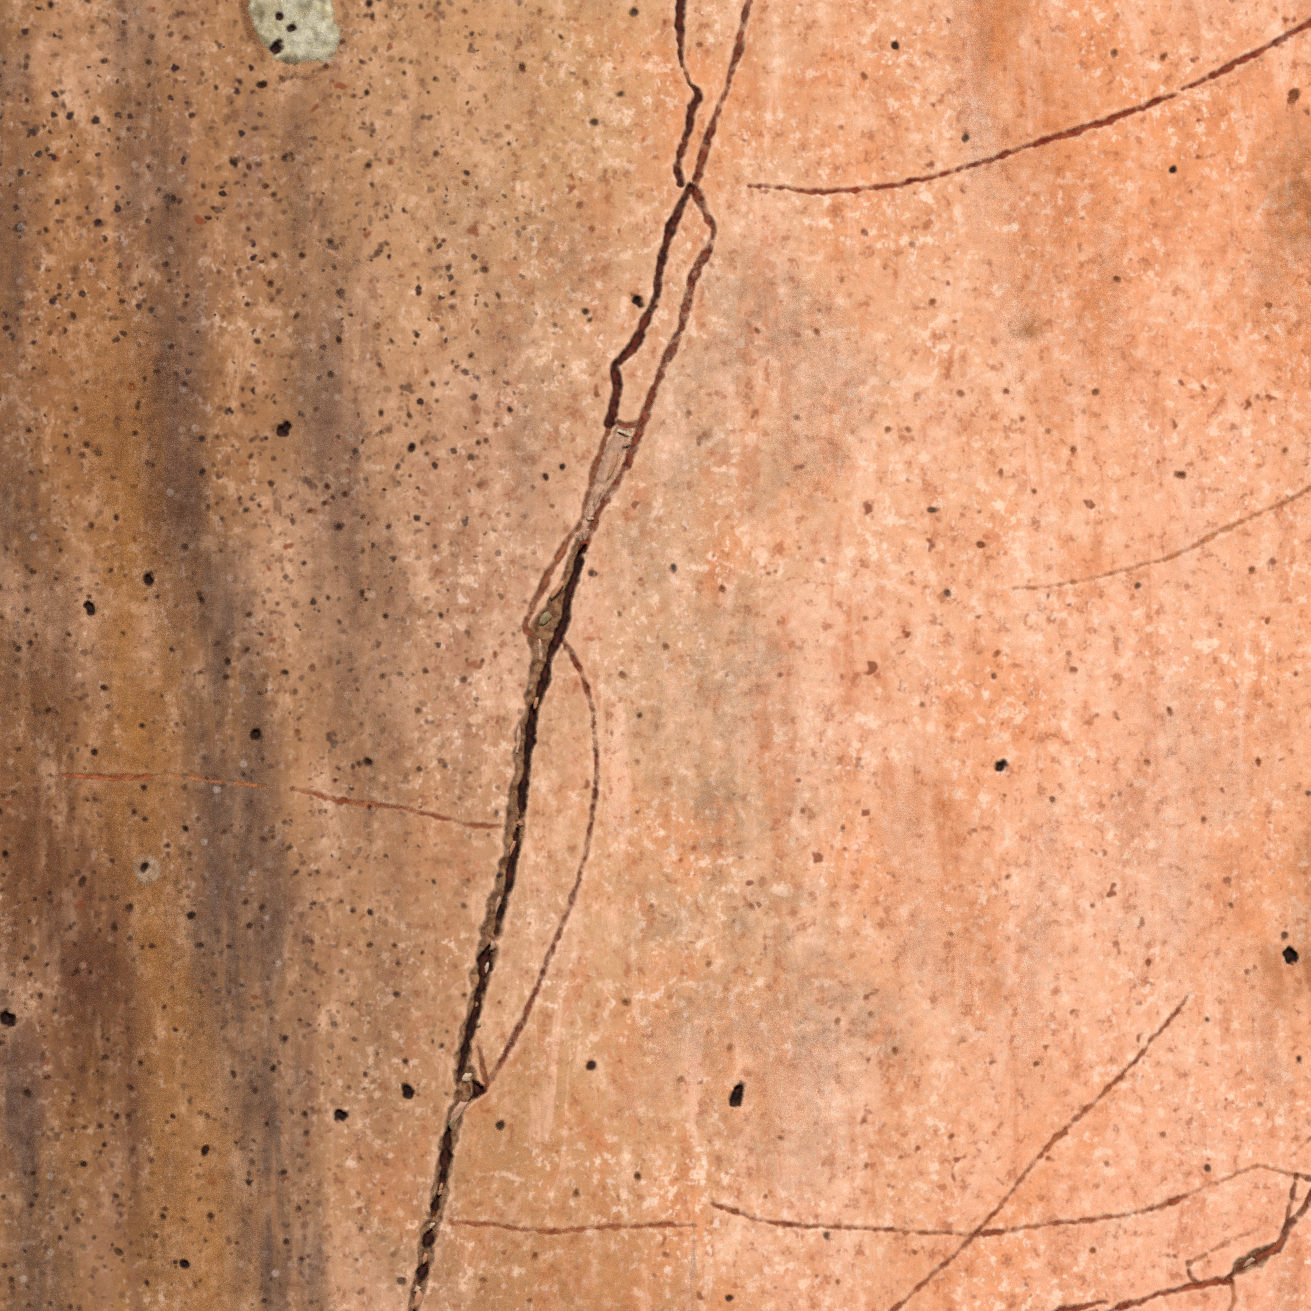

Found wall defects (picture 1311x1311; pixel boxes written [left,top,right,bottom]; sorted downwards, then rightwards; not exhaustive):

crack [748,19,1311,195]
crack [291,0,1188,1311]
crack [59,773,260,787]
leakage [196,736,262,994]
leakage [48,898,117,1025]
leakage [6,1054,35,1213]
leakage [247,1061,280,1176]
crack [1055,1165,1311,1311]